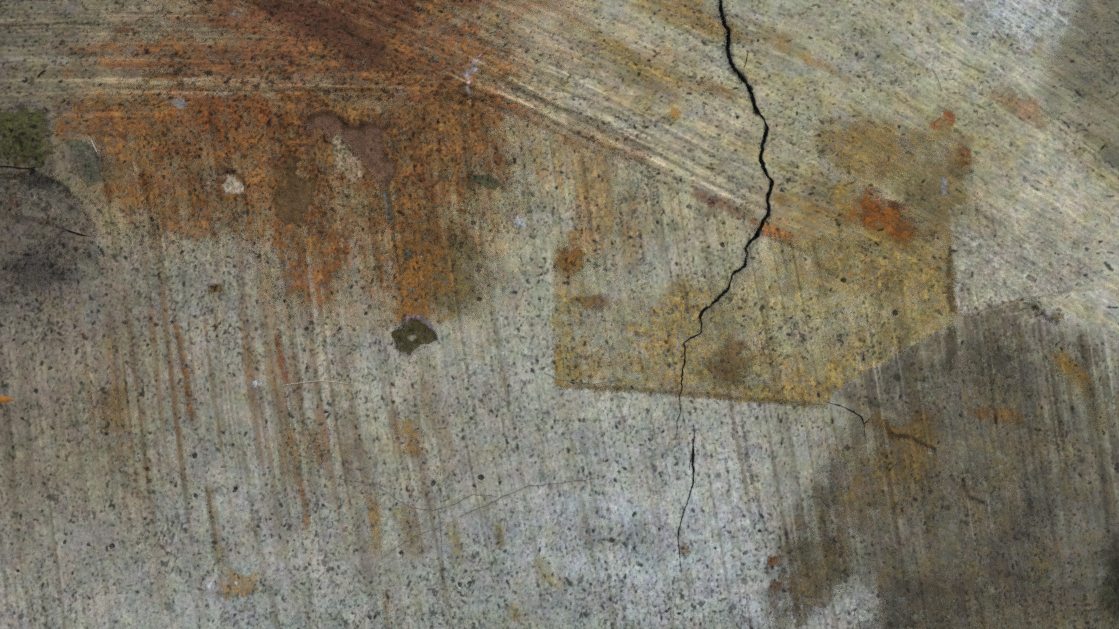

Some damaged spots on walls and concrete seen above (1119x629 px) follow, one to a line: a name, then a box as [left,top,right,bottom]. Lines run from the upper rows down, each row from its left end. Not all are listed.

corrosion [149,291,193,456]
corrosion [241,293,309,529]
corrosion [54,0,536,321]
spalling [391,314,437,355]
corrosion [567,167,611,267]
crack [675,0,774,570]
corrosion [698,192,793,241]
leakage [536,134,1119,629]
corrosion [817,111,972,248]